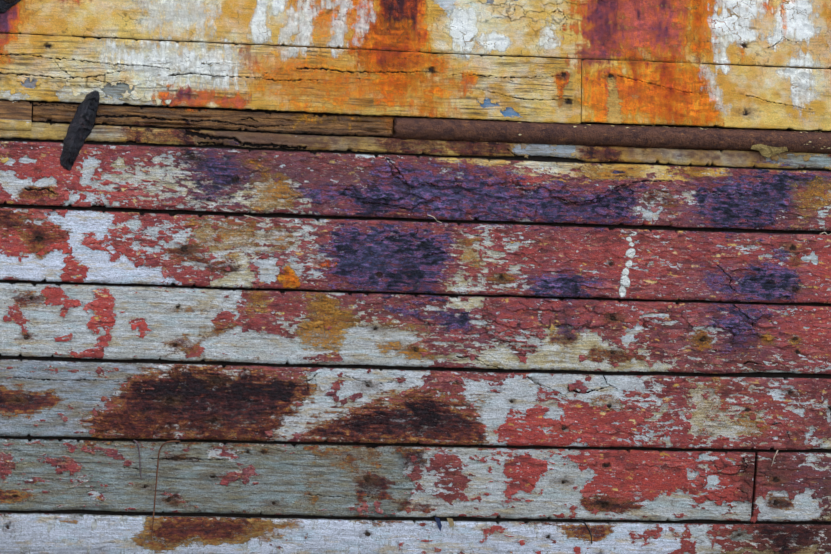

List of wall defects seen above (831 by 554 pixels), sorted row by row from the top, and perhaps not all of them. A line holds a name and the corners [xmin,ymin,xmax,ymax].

peeling [433,0,456,18]
crack [0,53,430,83]
corrosion [153,0,478,121]
crack [452,73,569,101]
corrosion [556,0,726,126]
corrosion [0,186,71,259]
crack [362,158,457,238]
crack [557,180,672,220]
peeling [0,153,831,554]
corrosion [0,384,68,419]
corrosion [80,322,490,527]
corrosion [130,510,303,553]